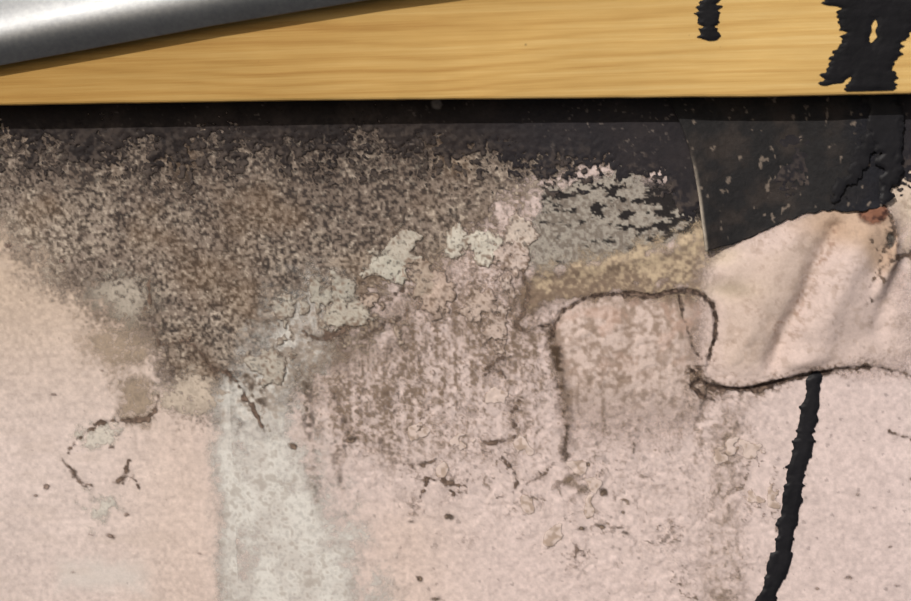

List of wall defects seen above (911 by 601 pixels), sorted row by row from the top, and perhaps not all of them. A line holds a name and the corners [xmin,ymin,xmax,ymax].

leakage [0,121,719,463]